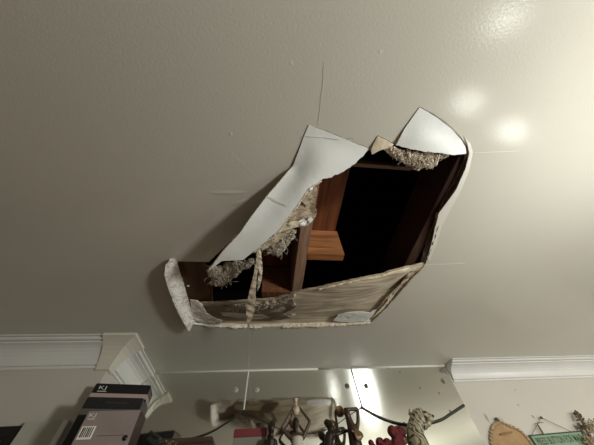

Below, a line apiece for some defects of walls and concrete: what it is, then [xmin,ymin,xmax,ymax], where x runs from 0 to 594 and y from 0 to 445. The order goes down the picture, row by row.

peeling [427,138,473,261]
peeling [190,299,222,323]
peeling [333,309,377,323]